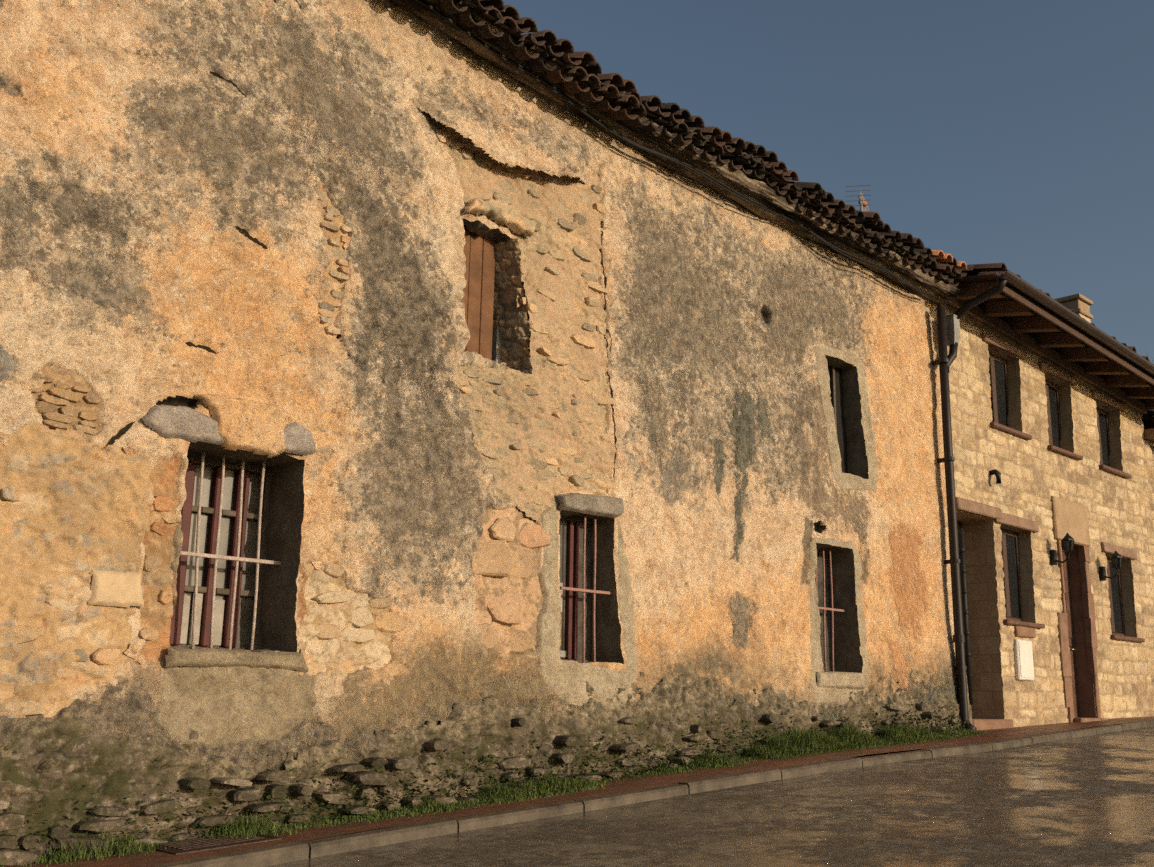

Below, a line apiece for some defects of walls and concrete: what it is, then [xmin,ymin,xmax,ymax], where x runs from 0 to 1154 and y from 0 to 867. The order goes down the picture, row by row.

crack [210,71,246,96]
damp [0,170,127,258]
damp [63,256,160,314]
crack [235,226,268,249]
spalling [315,181,351,360]
spalling [436,129,617,653]
crack [599,221,617,481]
damp [754,256,855,367]
spalling [0,363,182,719]
damp [714,440,749,561]
spalling [299,561,407,676]
damp [0,677,165,746]